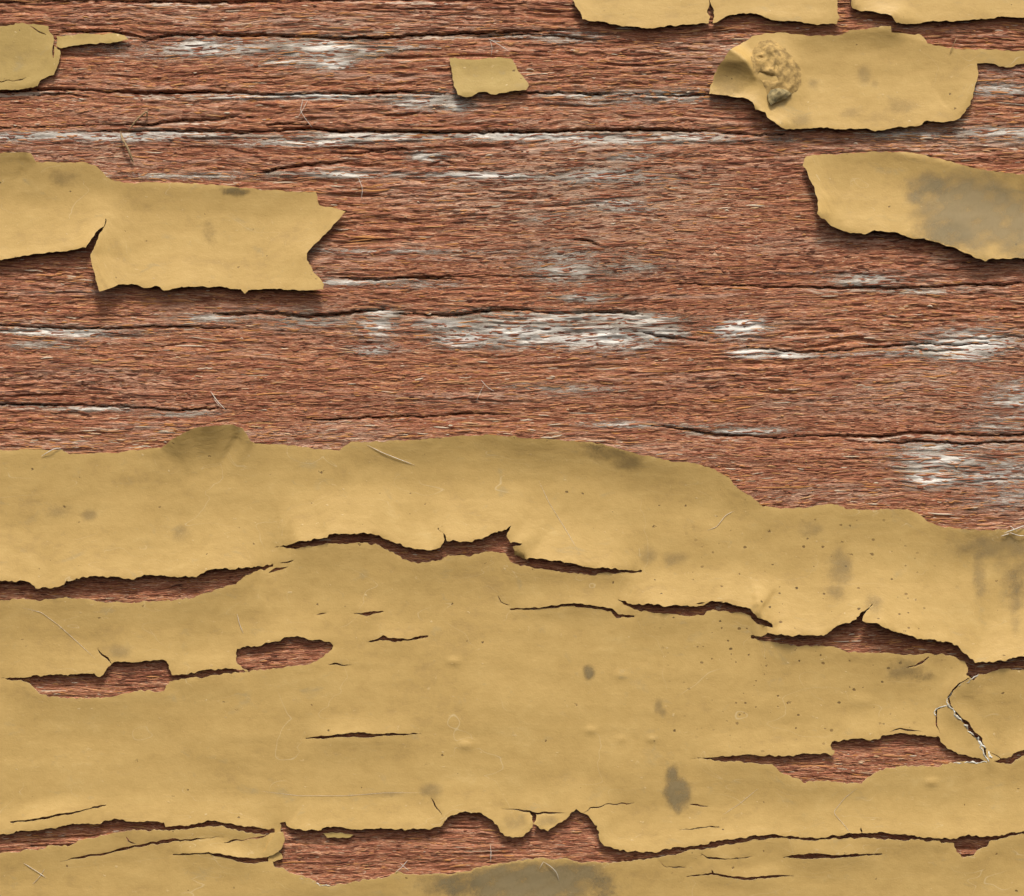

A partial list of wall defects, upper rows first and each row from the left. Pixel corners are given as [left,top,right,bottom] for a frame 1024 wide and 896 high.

peeling [0,23,128,90]
peeling [449,57,529,97]
peeling [573,0,1024,131]
peeling [0,152,346,294]
peeling [803,151,1024,261]
crack [306,731,421,739]
peeling [0,424,1024,896]
crack [498,596,1024,784]